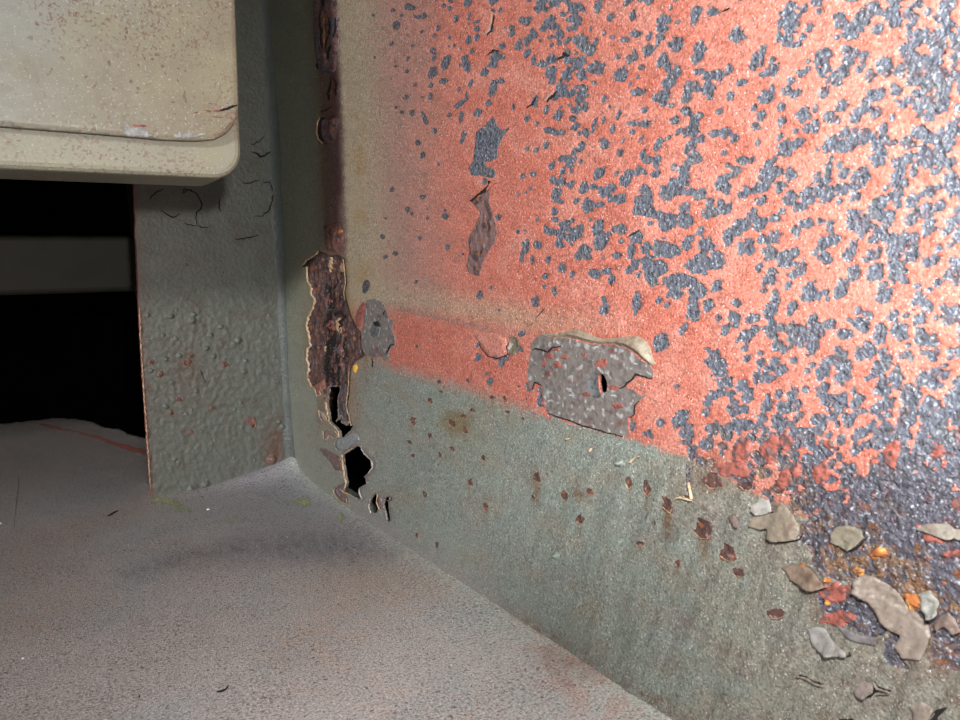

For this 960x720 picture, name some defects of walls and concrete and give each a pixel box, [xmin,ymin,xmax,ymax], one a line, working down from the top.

crack [150,188,221,228]
crack [235,137,274,240]
spalling [382,0,943,439]
rust [303,224,364,426]
peeling [318,410,359,504]
peeling [824,430,846,446]
peeling [728,485,803,543]
peeling [830,525,867,552]
peeling [782,564,960,670]